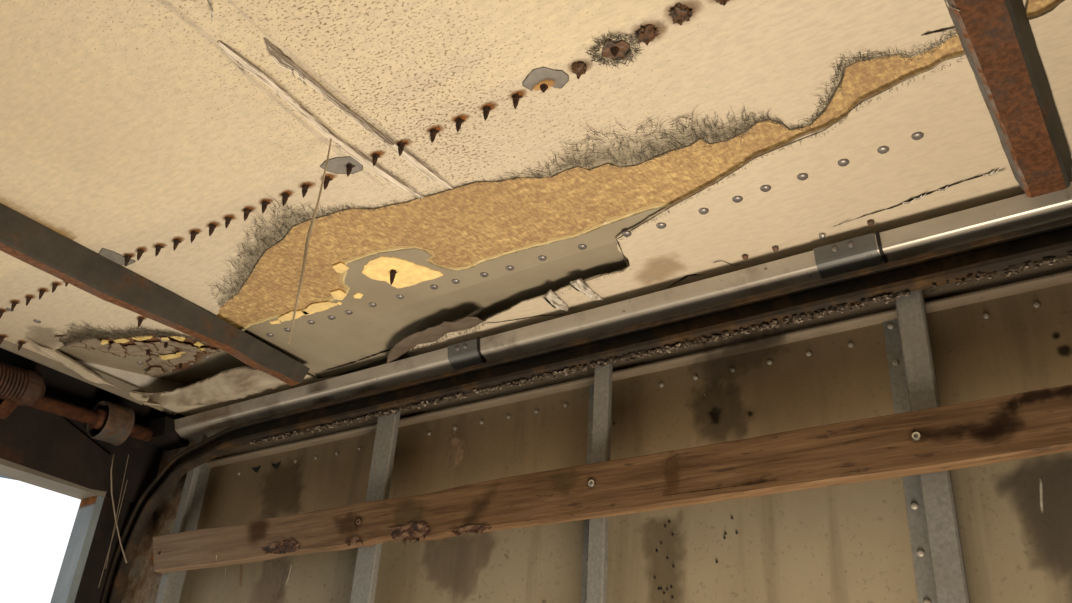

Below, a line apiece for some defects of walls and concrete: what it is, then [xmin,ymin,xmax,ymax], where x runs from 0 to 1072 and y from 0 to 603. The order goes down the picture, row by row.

crack [207,0,454,199]
peeling [205,27,965,331]
peeling [1025,0,1065,20]